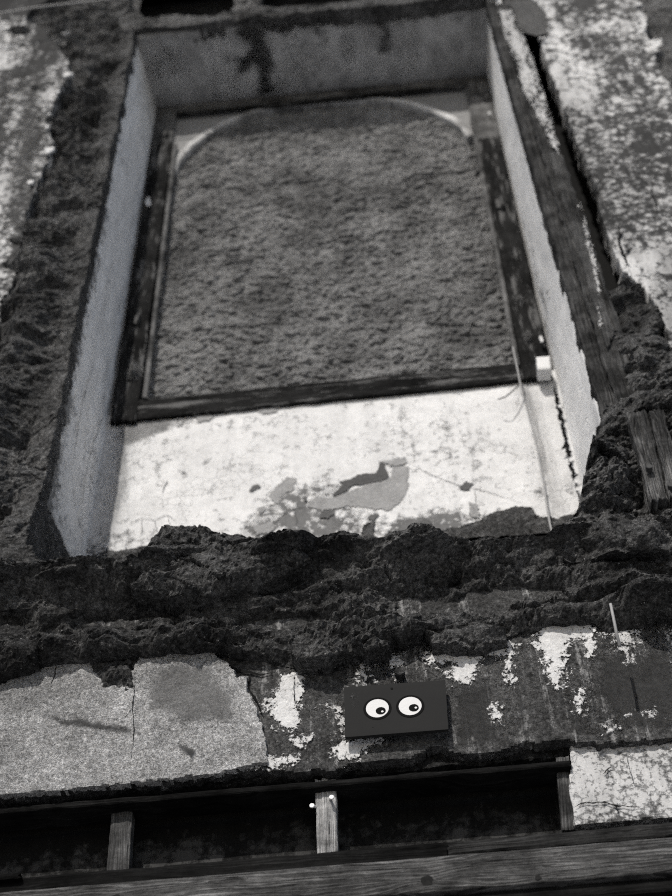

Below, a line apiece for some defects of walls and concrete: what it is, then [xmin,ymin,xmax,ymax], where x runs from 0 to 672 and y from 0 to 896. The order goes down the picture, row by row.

damp [235,24,274,95]
peeling [500,0,559,150]
flaking render [635,0,672,93]
flaking render [0,0,488,562]
flaking render [442,202,672,565]
crack [127,674,135,764]
flaking render [7,672,314,808]
peeling [353,660,377,686]
flaking render [315,701,570,780]
peeling [422,625,643,715]